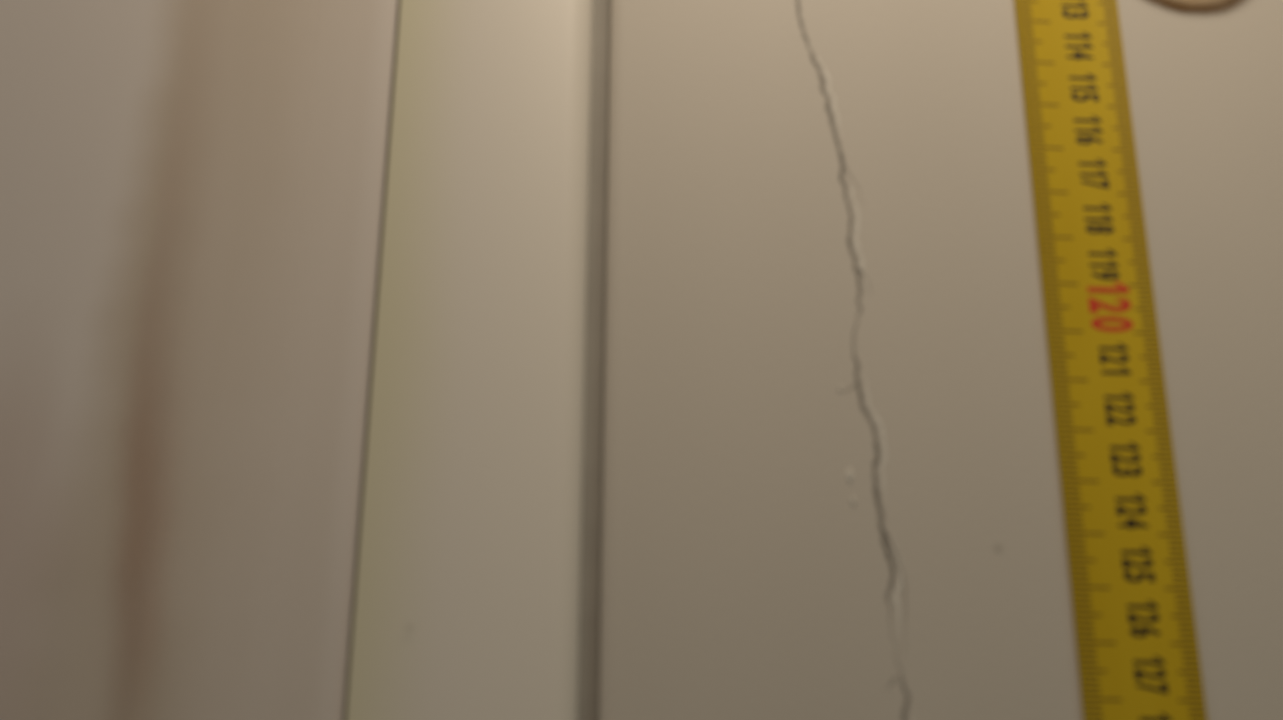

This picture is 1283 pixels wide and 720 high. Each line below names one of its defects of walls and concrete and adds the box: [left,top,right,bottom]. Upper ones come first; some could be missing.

crack [816,50,843,139]
crack [849,181,868,291]
crack [838,369,904,636]